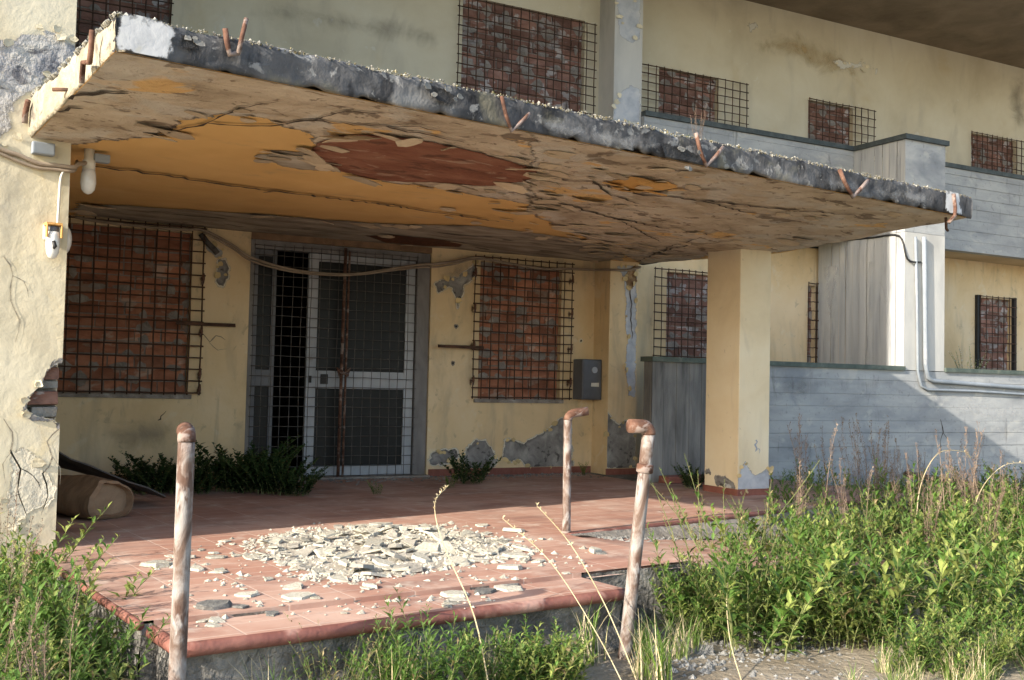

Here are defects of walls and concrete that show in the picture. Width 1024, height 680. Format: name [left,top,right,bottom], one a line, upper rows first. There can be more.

peeling [0,24,964,397]
crack [515,179,856,262]
spalling [21,358,62,429]
crack [2,419,61,515]
peeling [428,417,575,475]
peeling [603,413,637,468]
peeling [705,461,774,495]